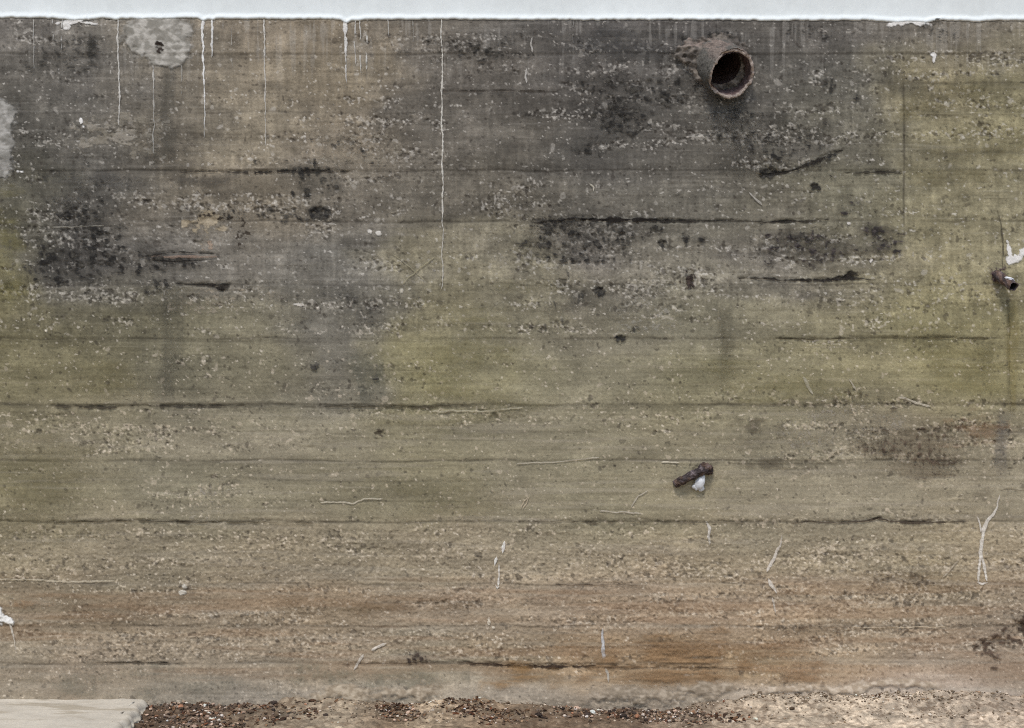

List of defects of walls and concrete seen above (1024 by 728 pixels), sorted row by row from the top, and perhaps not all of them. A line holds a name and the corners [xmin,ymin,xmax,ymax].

corrosion [672,462,714,492]